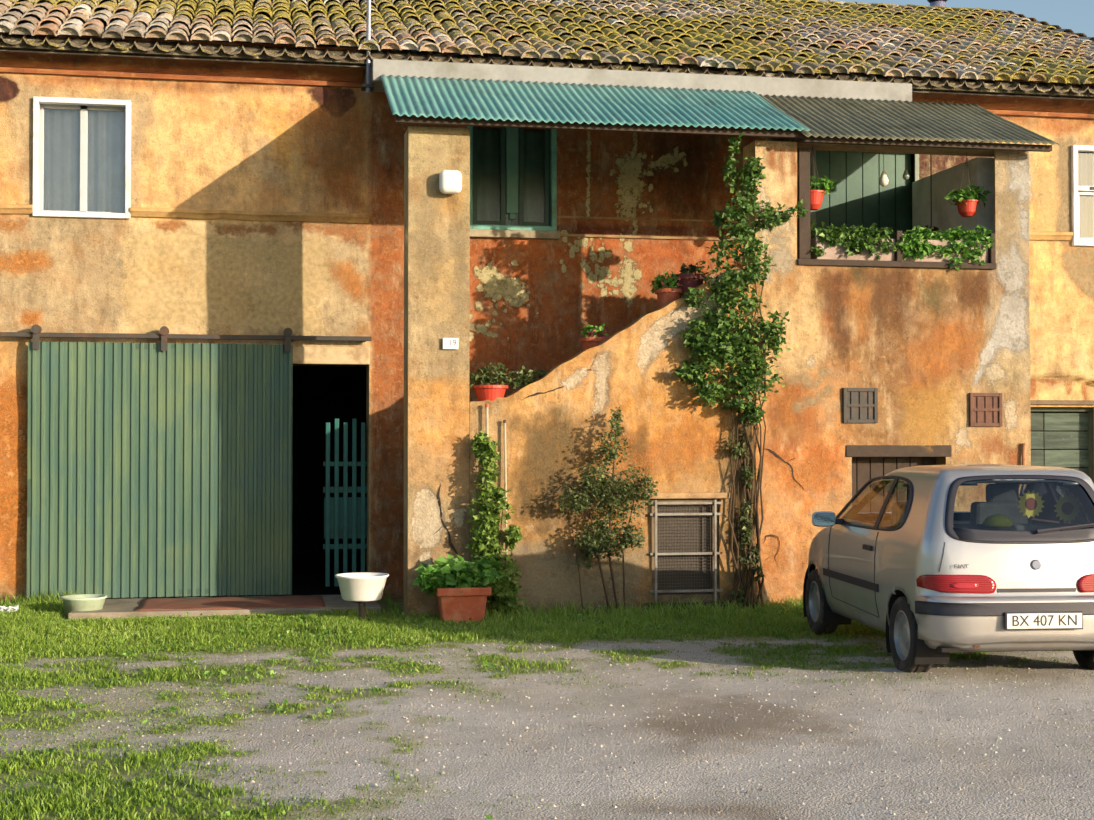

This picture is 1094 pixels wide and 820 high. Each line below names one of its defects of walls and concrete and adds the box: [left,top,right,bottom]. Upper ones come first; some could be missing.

peeling [609,146,688,221]
peeling [469,260,539,341]
peeling [559,230,642,308]
spalling [638,269,741,374]
leakage [826,273,848,356]
leakage [859,269,909,327]
leakage [956,269,987,304]
spalling [975,153,1032,386]
crack [522,385,565,400]
crack [766,449,804,489]
spalling [411,487,465,567]
crack [434,483,458,555]